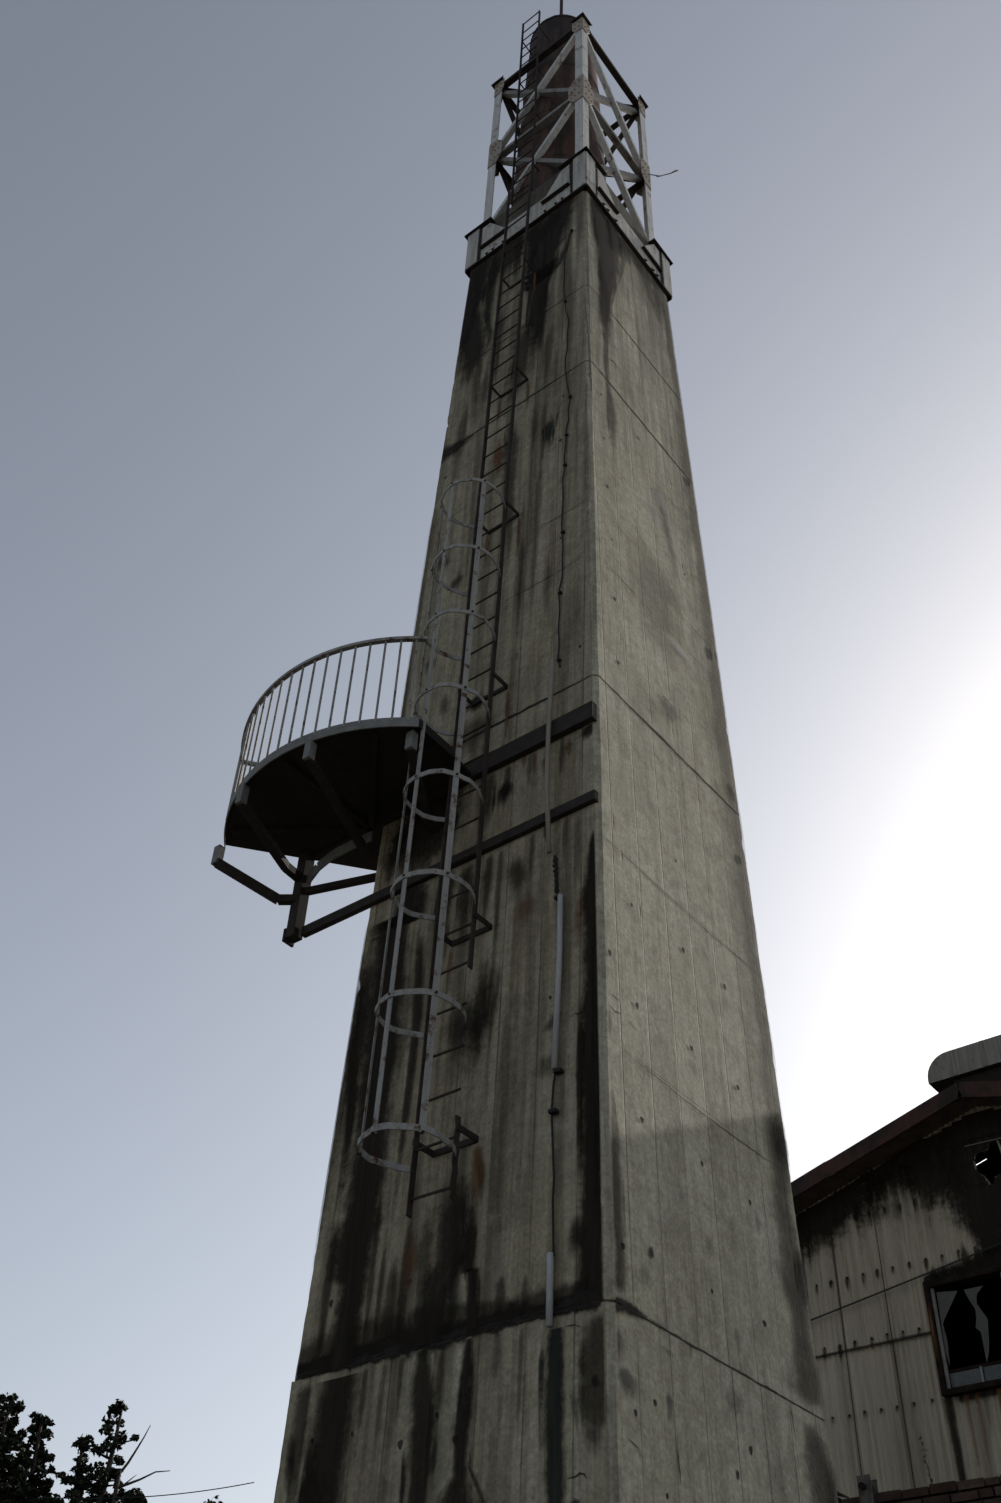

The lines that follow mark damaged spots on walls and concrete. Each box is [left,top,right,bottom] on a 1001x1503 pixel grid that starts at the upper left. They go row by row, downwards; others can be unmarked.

damp [456,196,639,443]
damp [441,438,469,462]
damp [484,767,511,816]
damp [286,787,663,1503]
damp [773,1124,788,1163]
damp [796,1108,1001,1298]